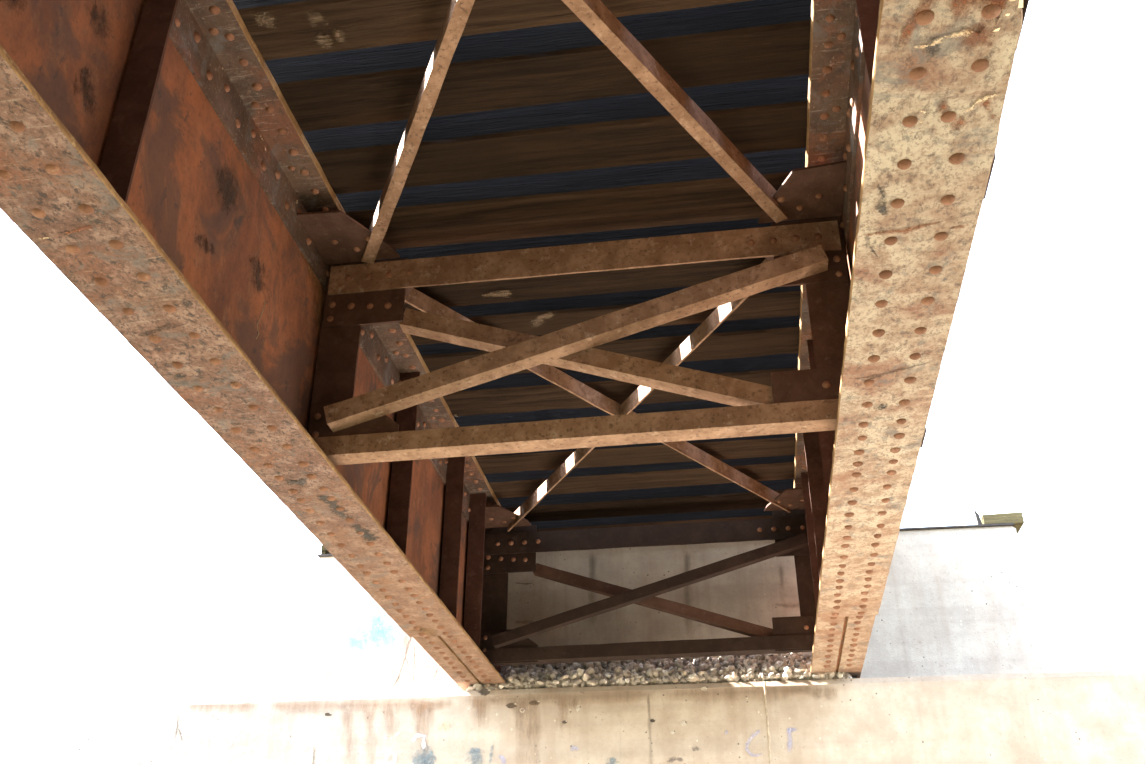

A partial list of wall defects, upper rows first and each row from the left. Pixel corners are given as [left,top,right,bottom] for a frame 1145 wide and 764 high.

rust [950,0,1006,47]
rust [865,222,939,236]